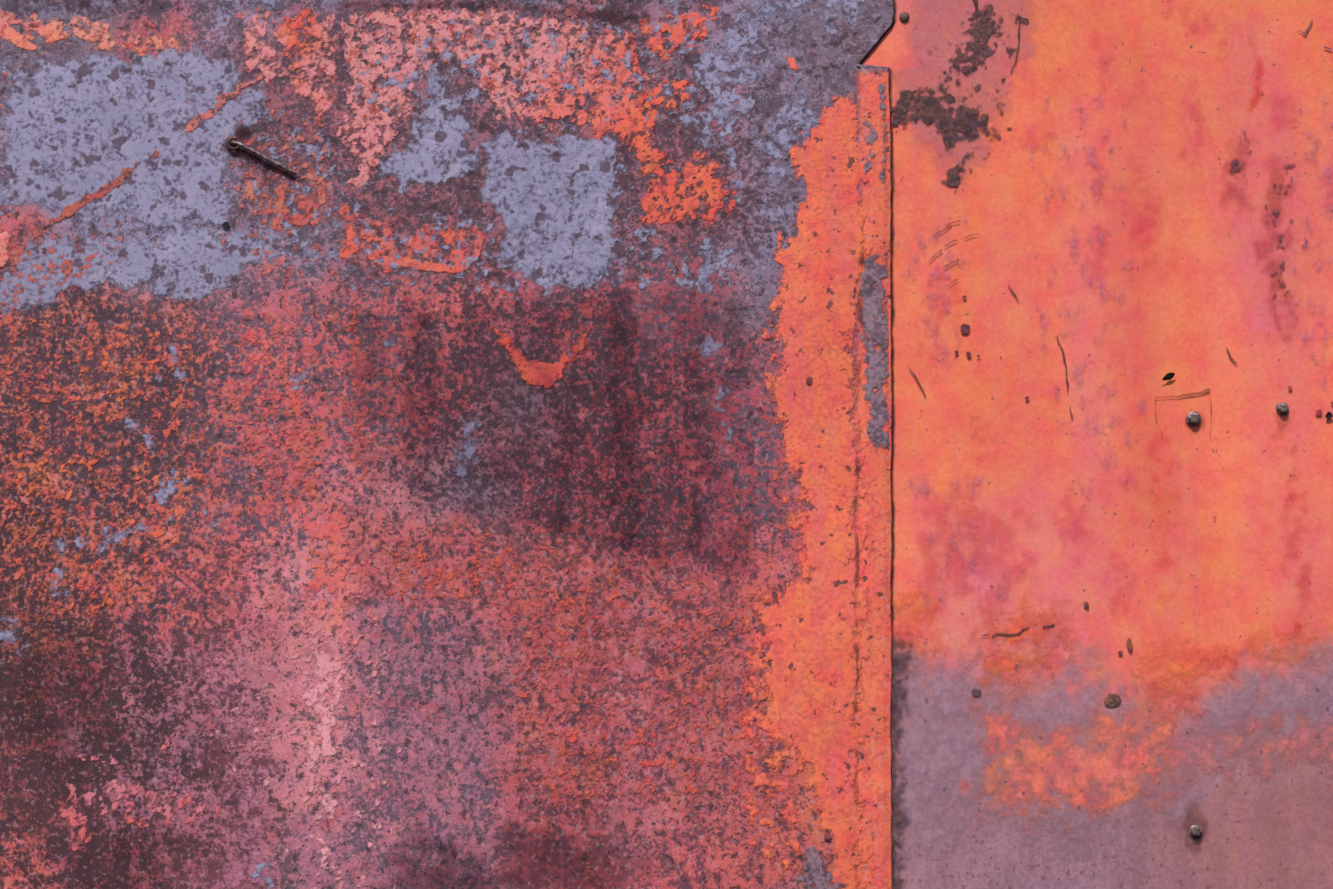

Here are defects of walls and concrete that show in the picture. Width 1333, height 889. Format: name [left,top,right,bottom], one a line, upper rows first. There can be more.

corrosion [857,0,896,69]
spalling [890,4,1029,192]
corrosion [0,231,10,267]
corrosion [1265,205,1308,298]
peeling [0,0,865,889]
corrosion [888,67,910,889]
corrosion [1104,693,1121,707]